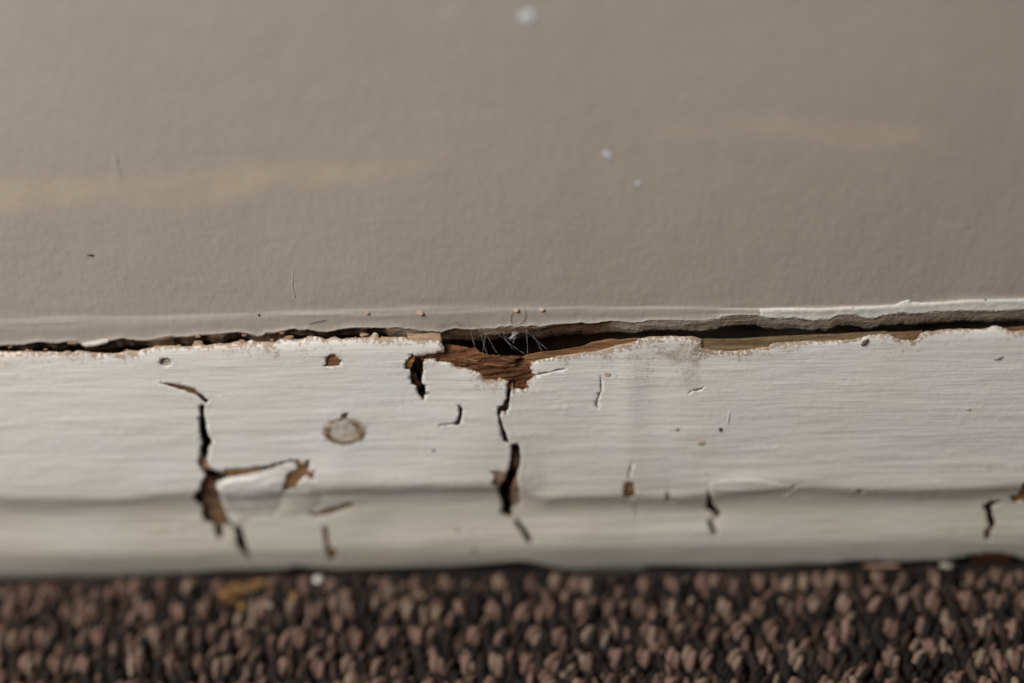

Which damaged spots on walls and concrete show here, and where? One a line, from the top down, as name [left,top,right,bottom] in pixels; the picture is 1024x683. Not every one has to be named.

crack [0,310,1024,557]
peeling [524,338,638,366]